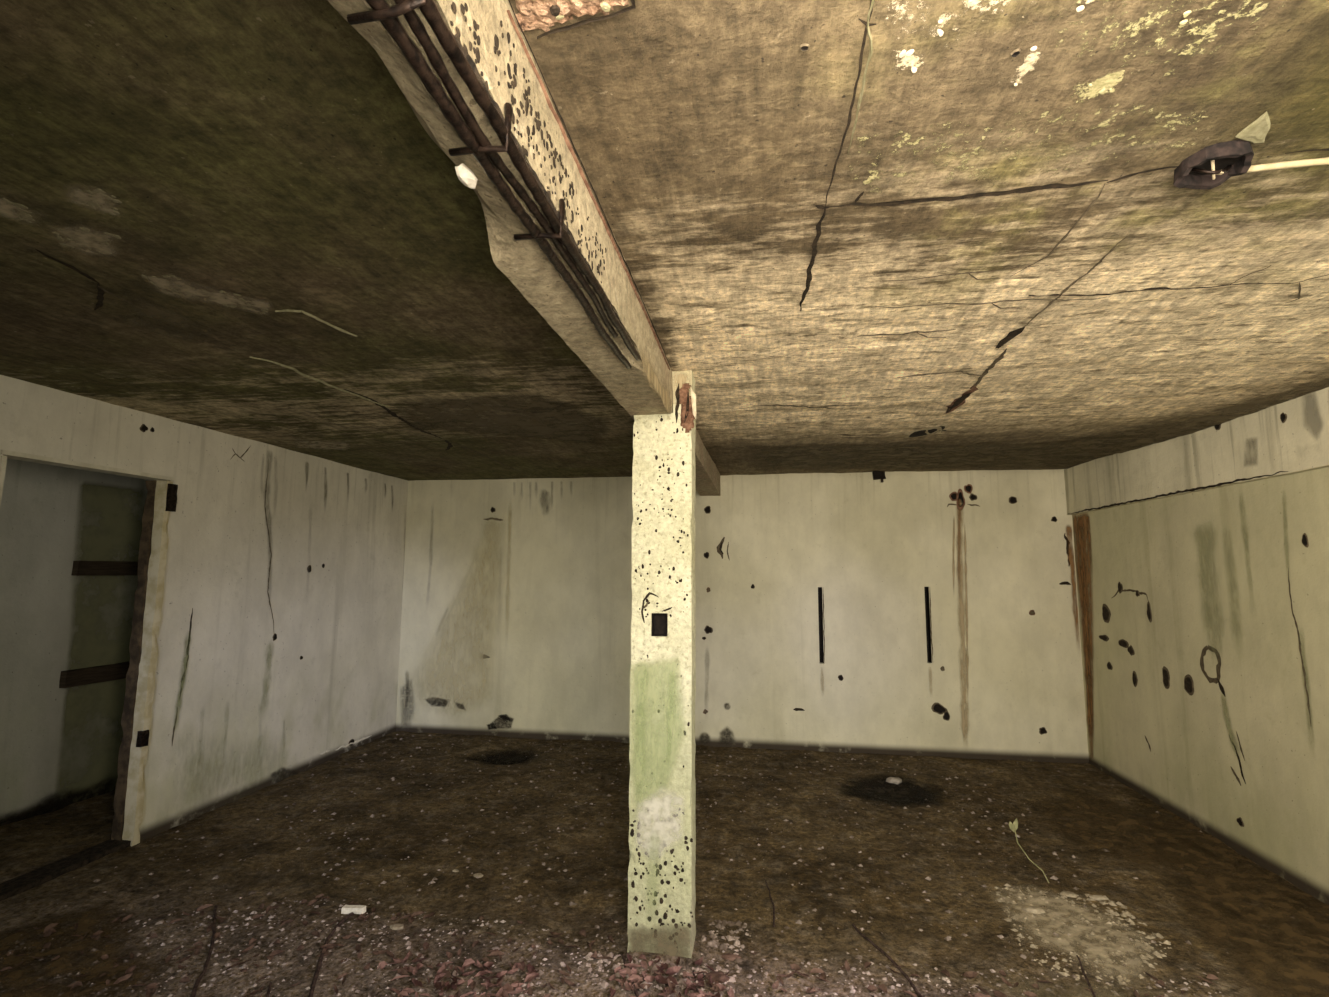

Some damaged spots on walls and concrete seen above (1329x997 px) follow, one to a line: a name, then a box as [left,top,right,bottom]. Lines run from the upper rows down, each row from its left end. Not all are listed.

peeling [0,198,35,223]
peeling [74,188,122,215]
spalling [347,0,642,369]
crack [800,0,1329,414]
peeling [53,227,121,254]
peeling [141,275,268,314]
crack [758,402,859,410]
corrosion [953,500,969,738]